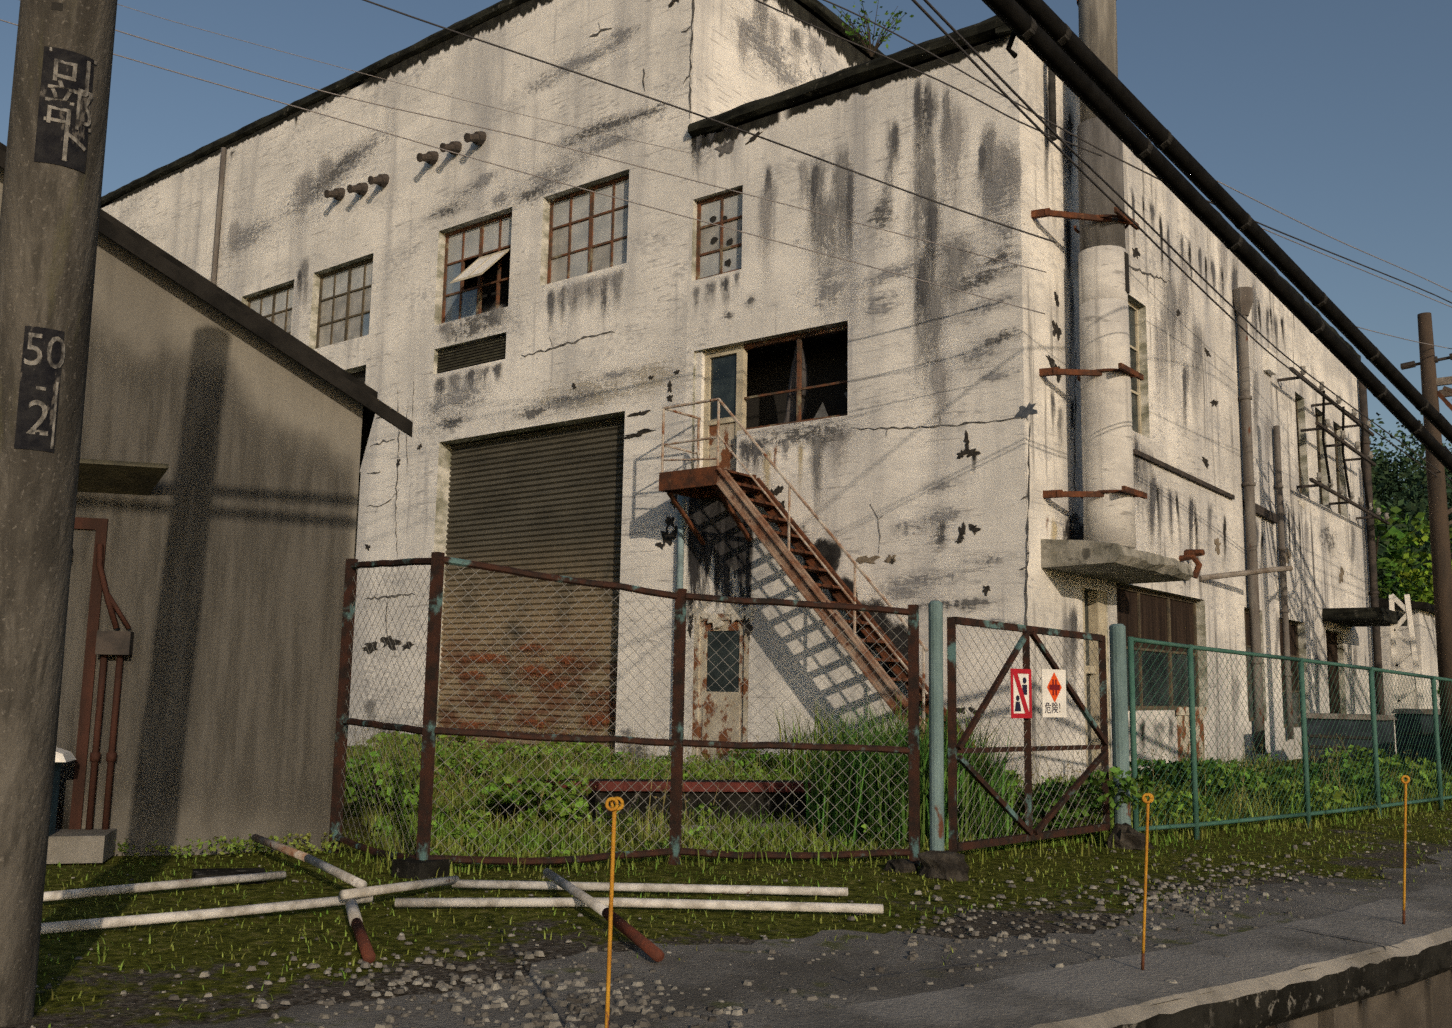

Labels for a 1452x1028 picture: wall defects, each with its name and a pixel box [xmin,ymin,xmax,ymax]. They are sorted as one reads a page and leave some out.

water stain [114,0,553,204]
water stain [522,26,640,94]
water stain [739,0,870,86]
water stain [224,133,383,257]
water stain [428,104,665,219]
water stain [691,35,1022,405]
water stain [439,306,503,343]
water stain [548,270,621,319]
crack [369,381,414,550]
water stain [1133,441,1226,560]
water stain [1256,503,1355,556]
crack [365,593,415,637]